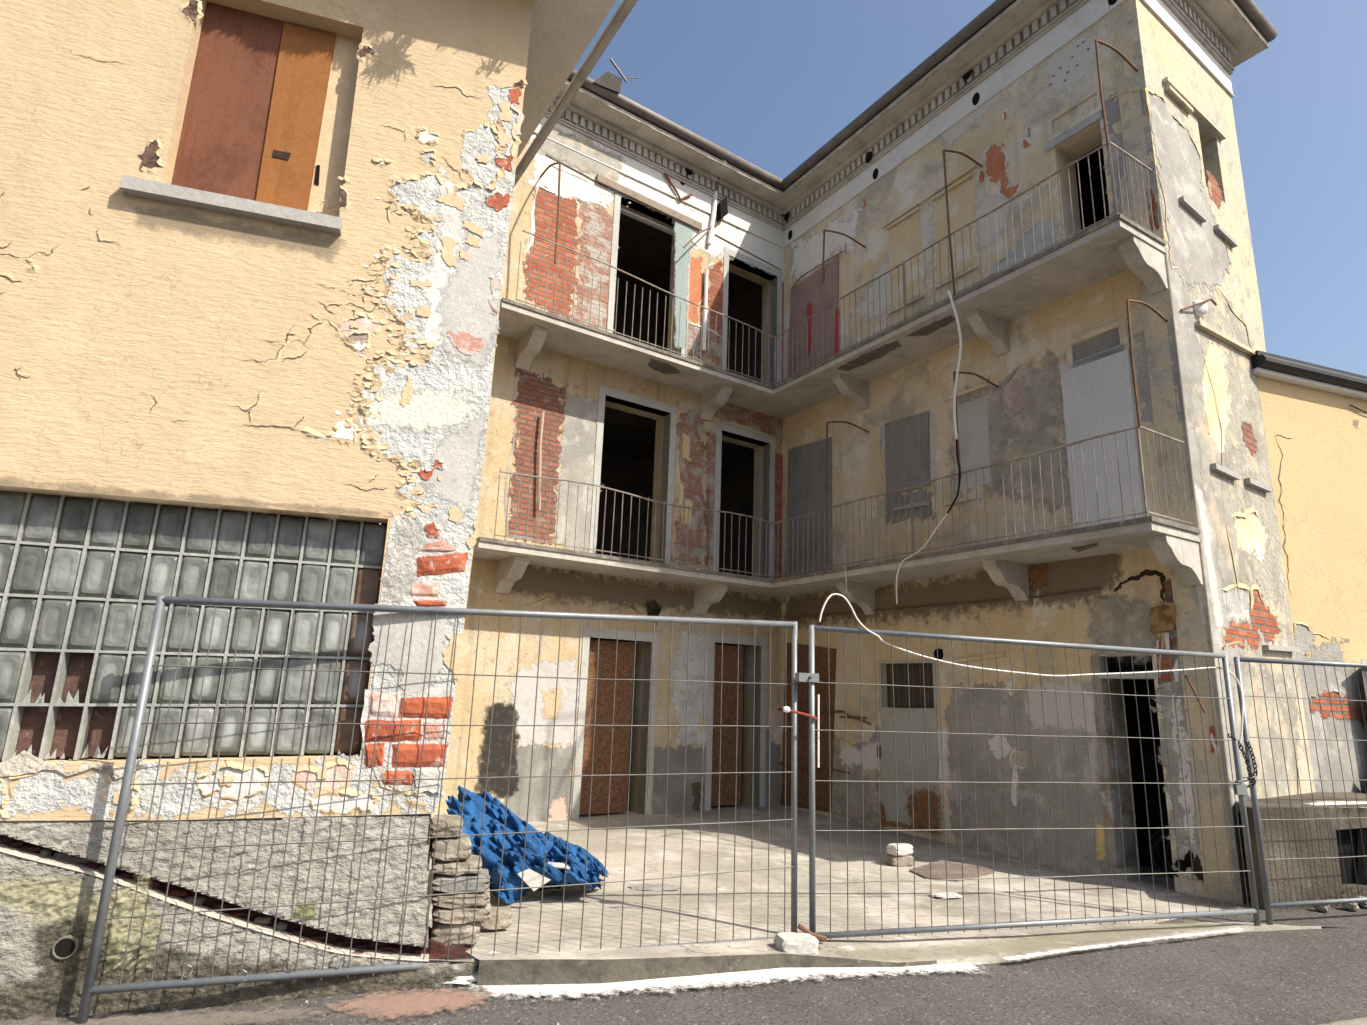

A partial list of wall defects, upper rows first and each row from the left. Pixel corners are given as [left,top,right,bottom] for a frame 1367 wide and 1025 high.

flaking render [977,125,1032,198]
crack [82,186,119,244]
crack [0,241,60,294]
crack [234,203,419,431]
crack [13,366,29,380]
flaking render [0,79,527,820]
flaking render [504,368,602,552]
flaking render [671,403,783,579]
flaking render [1102,86,1367,904]
crack [1114,569,1166,633]
flaking render [506,658,580,749]
flaking render [1094,821,1106,861]